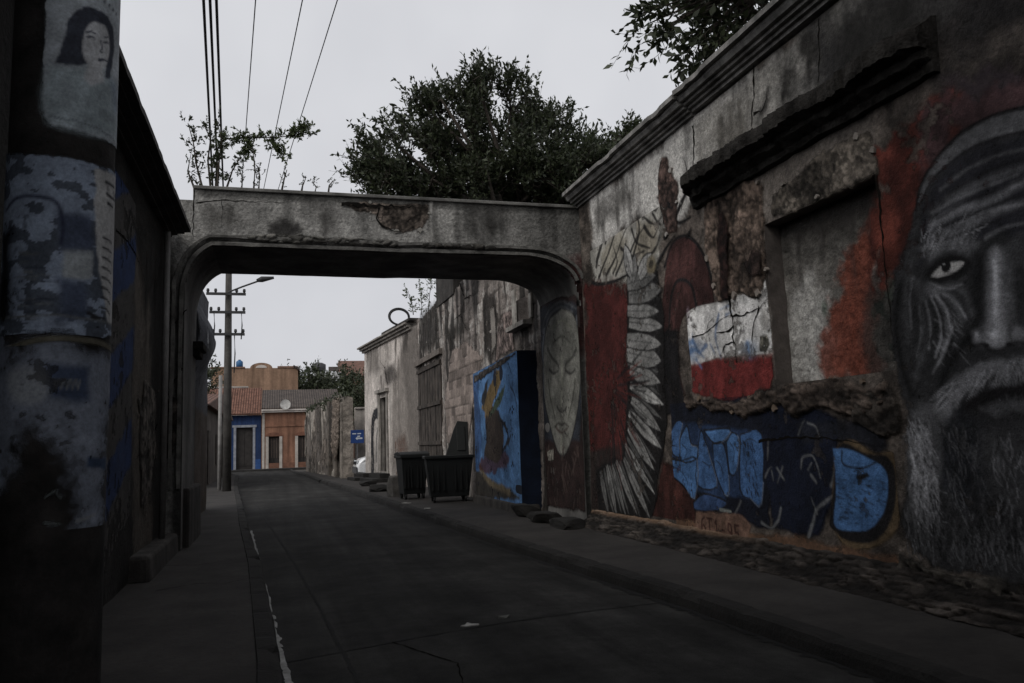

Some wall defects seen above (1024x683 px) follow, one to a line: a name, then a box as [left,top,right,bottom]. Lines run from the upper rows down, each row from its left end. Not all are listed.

flaking render [247,201,496,250]
flaking render [704,131,879,302]
crack [874,174,892,333]
crack [692,296,766,363]
flaking render [445,341,515,444]
flaking render [683,376,887,419]